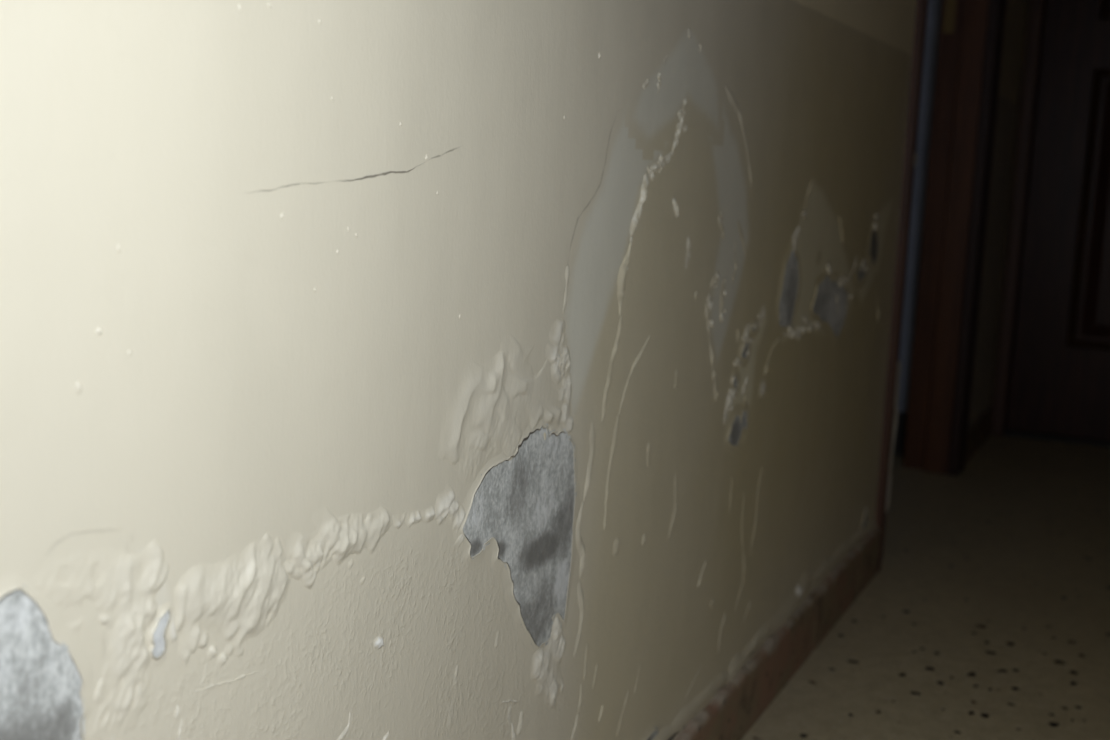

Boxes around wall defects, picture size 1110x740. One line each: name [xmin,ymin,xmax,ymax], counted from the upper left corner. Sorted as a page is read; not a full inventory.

leakage [554,6,898,469]
peeling [694,209,821,425]
spalling [453,420,580,653]
spalling [0,573,95,740]